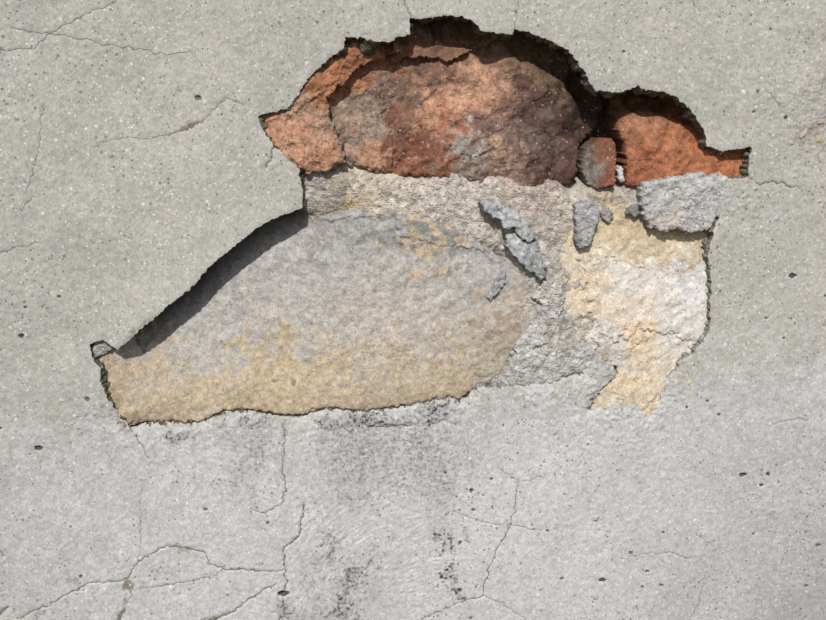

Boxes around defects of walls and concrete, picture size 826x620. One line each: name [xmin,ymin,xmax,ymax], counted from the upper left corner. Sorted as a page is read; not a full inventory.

crack [0,0,191,55]
crack [106,97,243,142]
spalling [90,15,752,428]
crack [20,422,304,620]
crack [421,468,545,620]